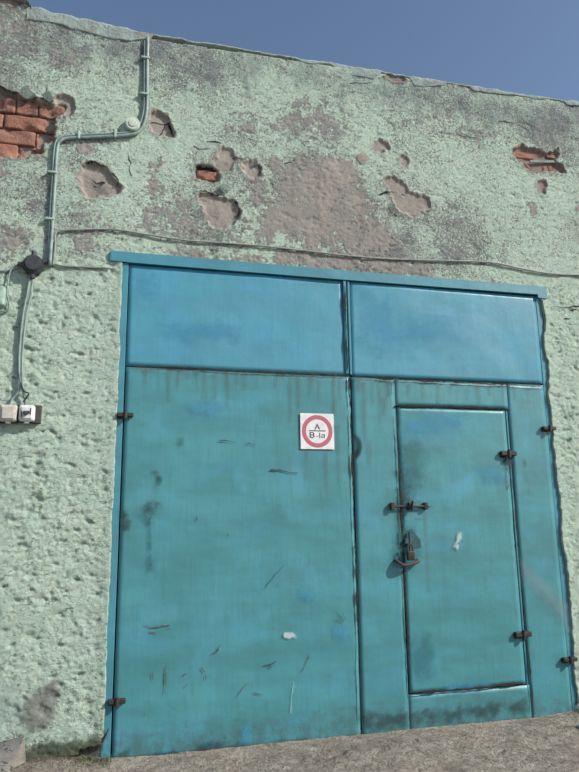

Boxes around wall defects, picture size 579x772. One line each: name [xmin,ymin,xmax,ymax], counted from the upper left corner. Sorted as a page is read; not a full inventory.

peeling [0,85,456,279]
flaking render [441,118,567,195]
rust [139,366,328,376]
rust [343,290,544,718]
water stain [22,684,58,728]